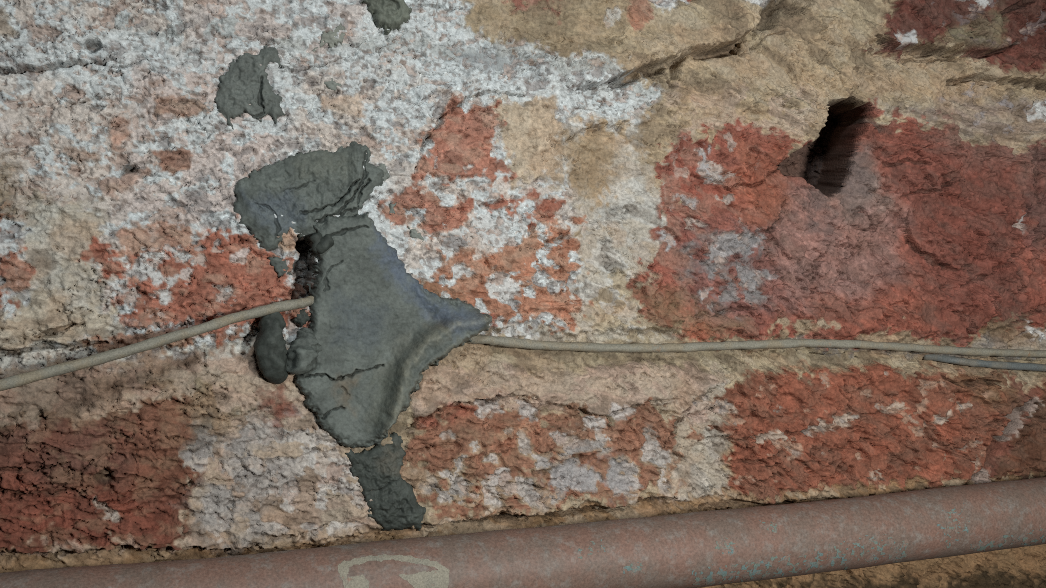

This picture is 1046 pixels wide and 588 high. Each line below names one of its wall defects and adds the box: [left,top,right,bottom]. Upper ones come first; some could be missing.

peeling [603,6,624,27]
peeling [649,0,688,13]
peeling [745,0,771,10]
crack [1000,0,1046,24]
crack [876,34,1046,94]
peeling [0,204,33,317]
spalling [0,384,265,561]
spalling [308,441,358,497]
crack [405,385,719,448]
spalling [402,359,1046,525]